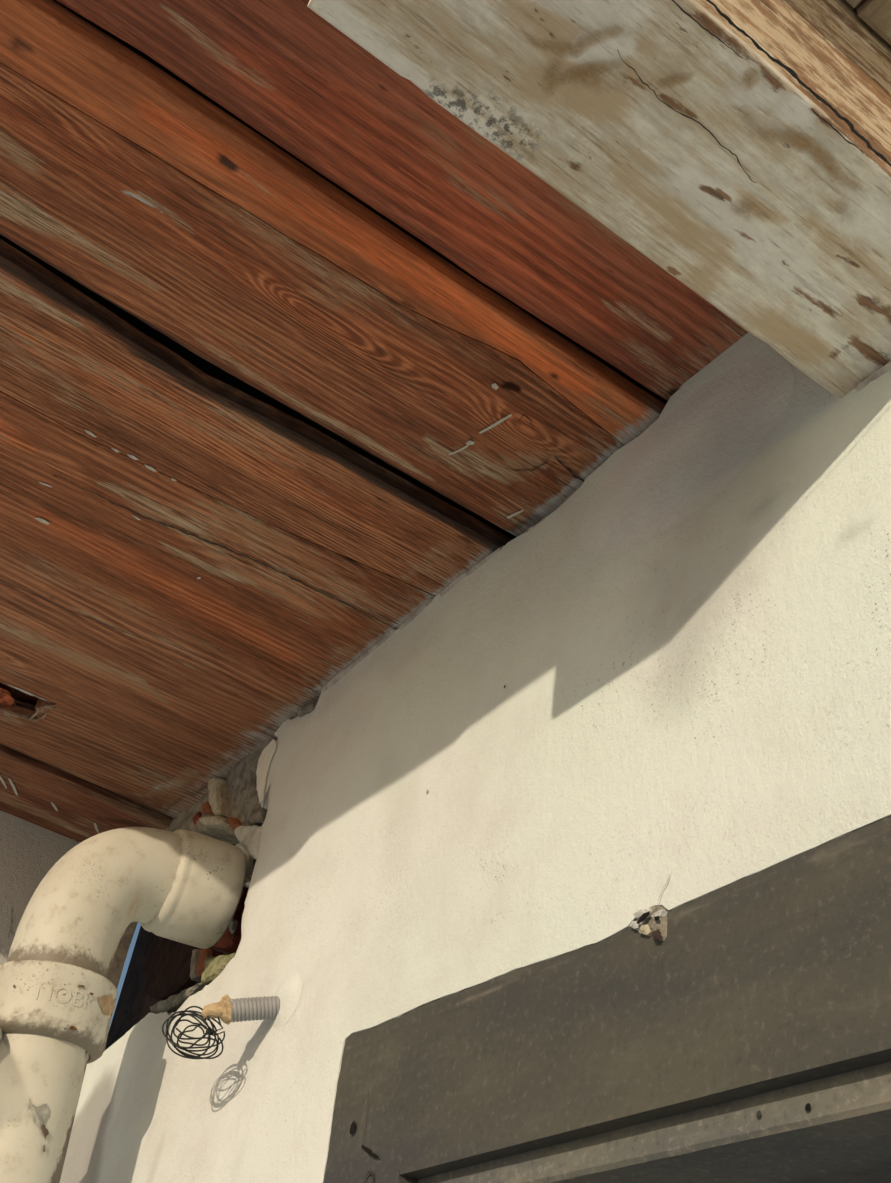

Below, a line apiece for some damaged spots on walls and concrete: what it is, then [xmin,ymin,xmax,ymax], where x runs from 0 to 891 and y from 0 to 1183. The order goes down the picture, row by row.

crack [618,51,756,183]
crack [672,0,891,166]
flaking render [144,739,277,1014]
flaking render [630,905,668,941]